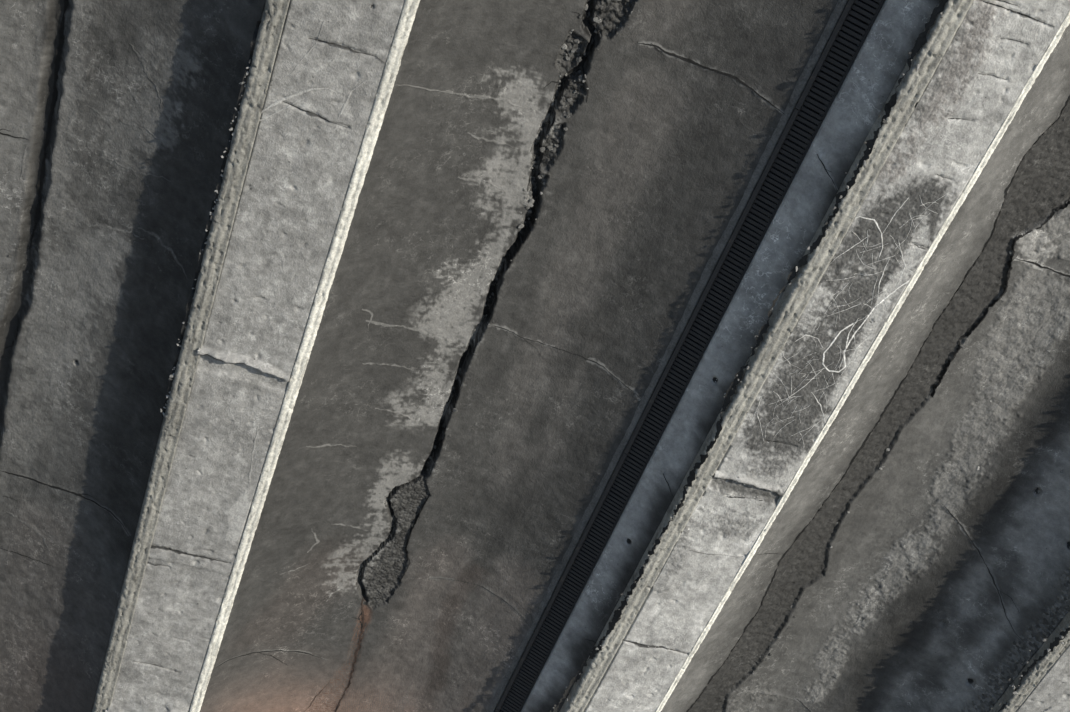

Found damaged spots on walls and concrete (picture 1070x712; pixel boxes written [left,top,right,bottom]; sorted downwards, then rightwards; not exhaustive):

crack [0,0,73,390]
corrosion [200,595,442,712]
spalling [357,470,432,610]
water stain [280,47,578,712]
crack [352,0,643,635]
water stain [403,219,683,712]
spalling [526,0,639,207]
crack [550,0,948,712]
spalling [687,95,1070,712]
water stain [716,189,1070,712]
water stain [888,16,975,160]
crack [981,0,1049,45]